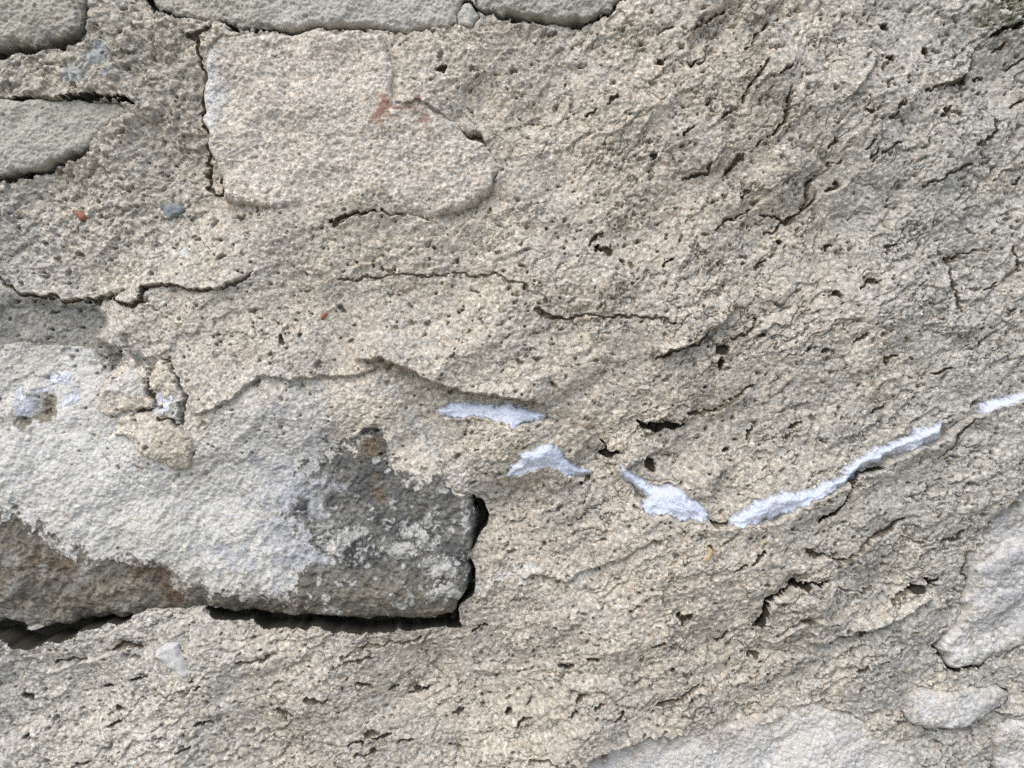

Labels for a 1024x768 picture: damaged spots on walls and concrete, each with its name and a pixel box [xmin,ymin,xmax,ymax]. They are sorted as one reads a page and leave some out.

crack [146,0,295,197]
crack [865,20,1024,160]
crack [682,19,842,271]
crack [922,99,1024,189]
crack [328,208,407,227]
crack [2,270,253,309]
crack [337,271,757,360]
crack [636,384,754,433]
crack [0,614,144,664]
crack [205,495,489,693]
crack [713,517,905,660]
crack [858,529,968,607]